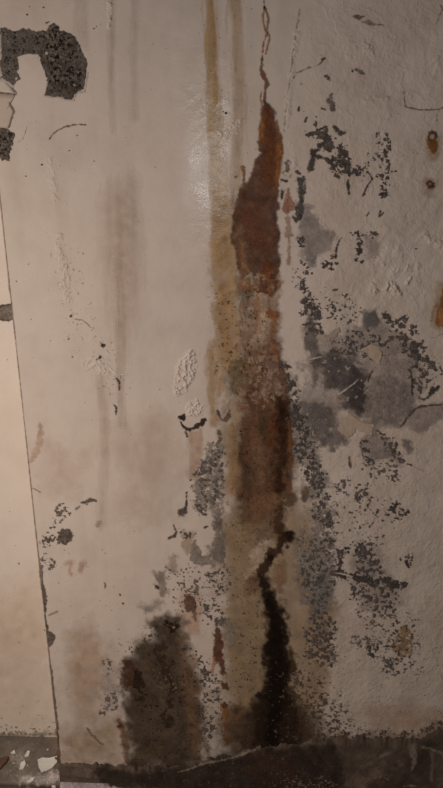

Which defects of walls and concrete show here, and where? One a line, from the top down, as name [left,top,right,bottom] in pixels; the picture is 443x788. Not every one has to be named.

flaking render [0,22,88,161]
crack [259,1,270,107]
crack [288,9,330,87]
rust [427,131,438,153]
rust [431,283,443,327]
rust [205,0,367,754]
peeling [278,93,443,676]
damp [60,614,443,788]